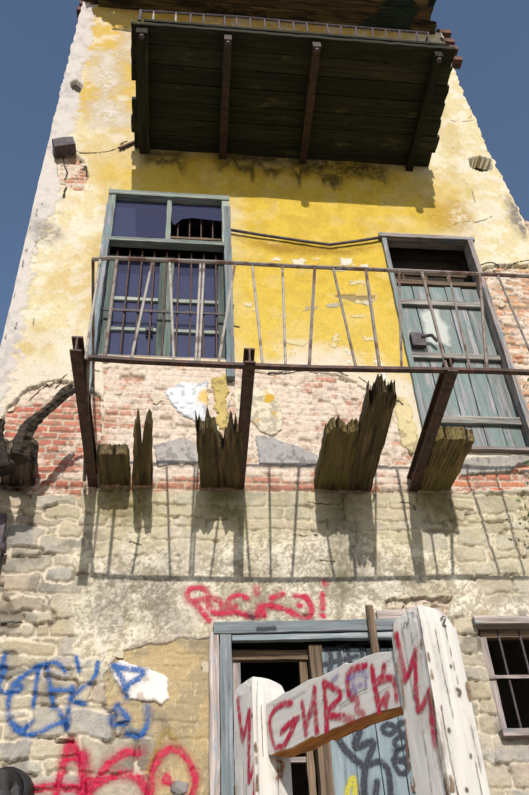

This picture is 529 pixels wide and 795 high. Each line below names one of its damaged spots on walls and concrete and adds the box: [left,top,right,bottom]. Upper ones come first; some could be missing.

flaking render [55,154,89,191]
water stain [223,154,277,178]
water stain [291,160,384,186]
peeling [335,258,369,271]
flaking render [305,295,376,310]
flaking render [483,267,529,410]
flaking render [3,363,418,498]
flaking render [452,455,529,495]